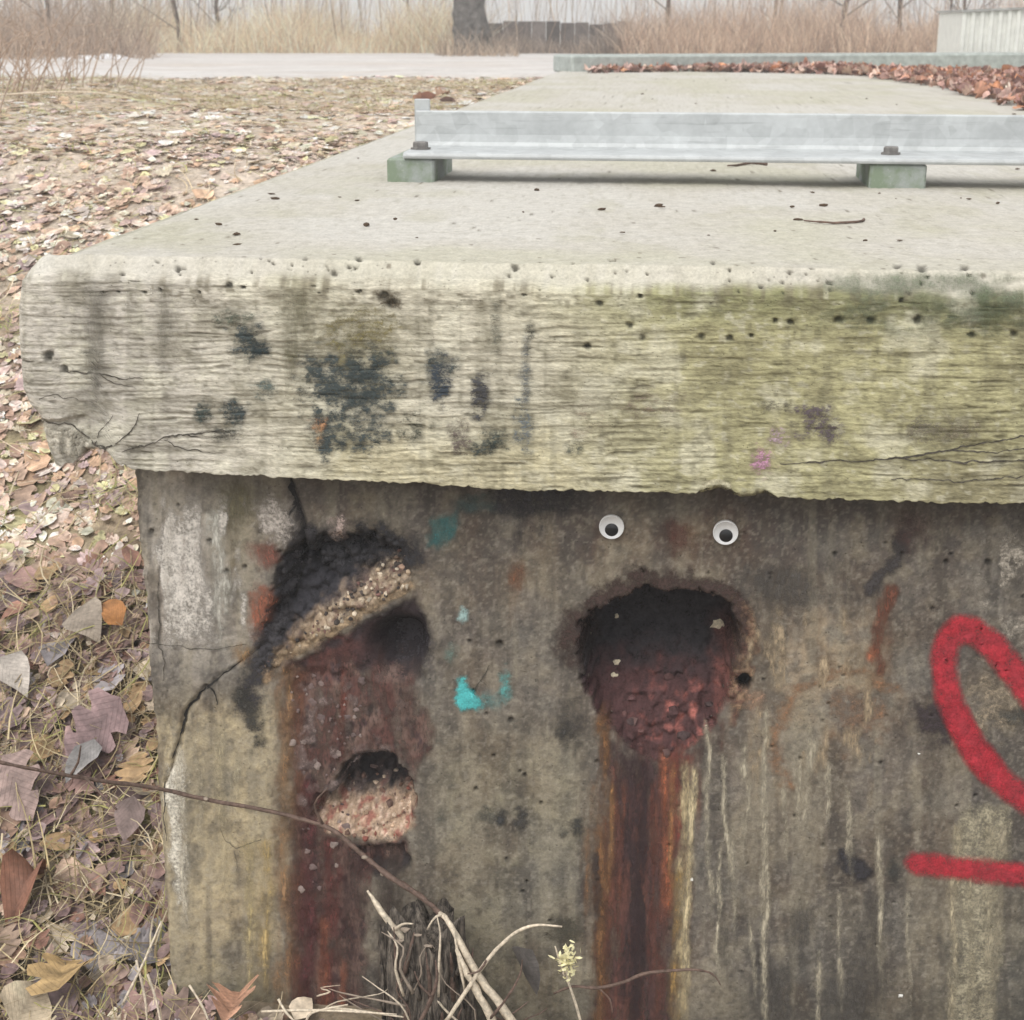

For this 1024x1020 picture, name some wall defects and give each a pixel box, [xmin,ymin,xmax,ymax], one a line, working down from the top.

crack [40,371,231,455]
crack [780,435,1024,483]
crack [144,567,255,758]
peeling [298,849,322,893]
spalling [259,531,429,879]
corrosion [275,648,433,1008]
corrosion [584,717,696,1020]
spalling [556,567,764,760]
damp [671,725,735,1014]
damp [741,712,791,1020]
damp [781,732,831,818]
damp [836,796,899,882]